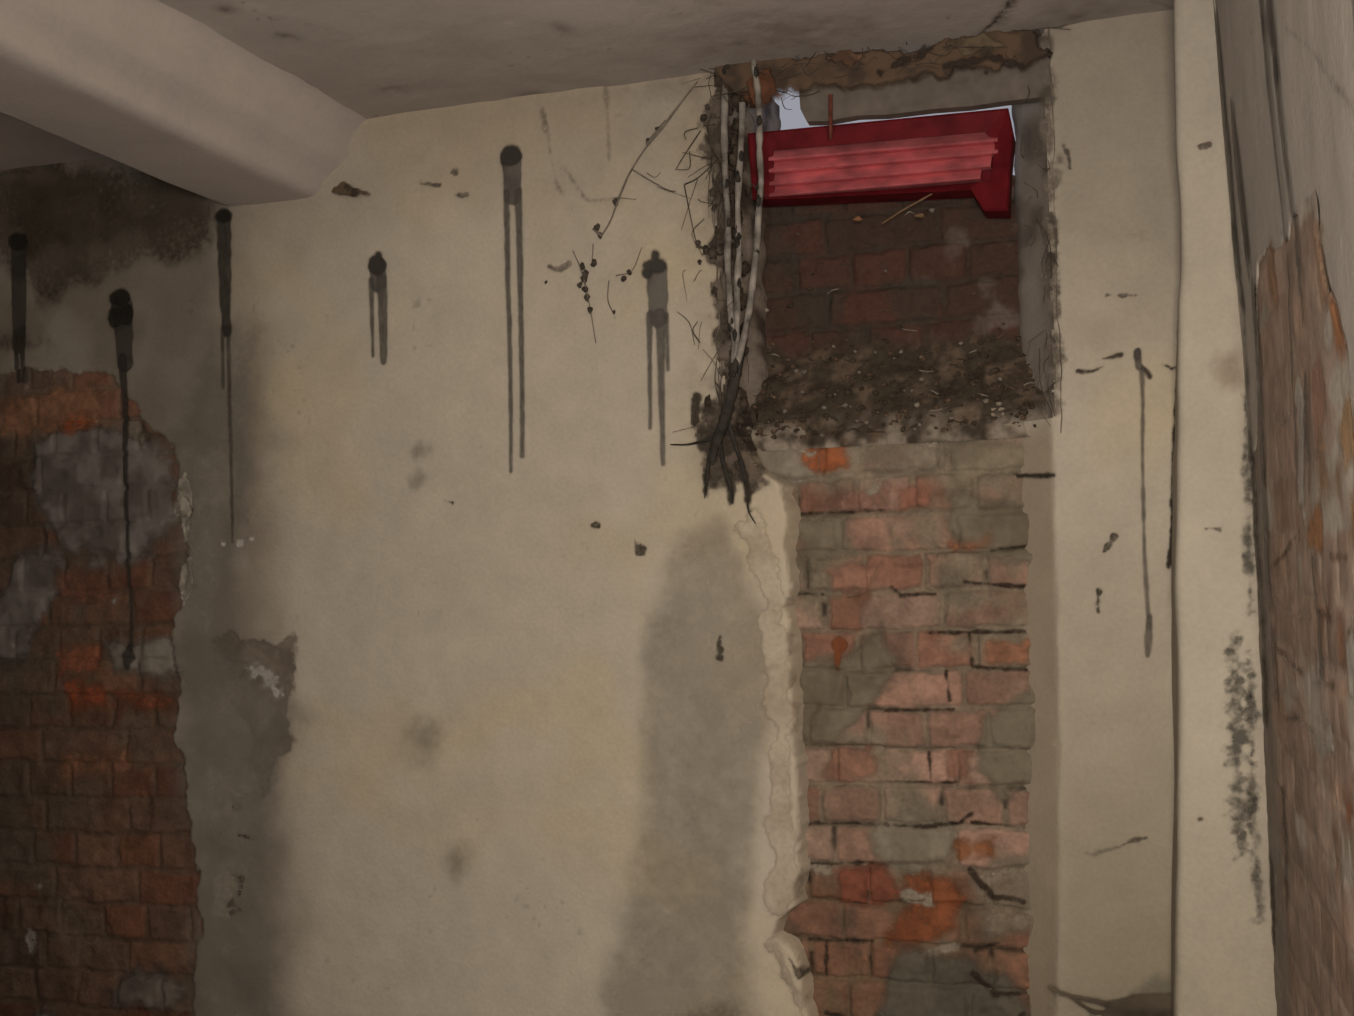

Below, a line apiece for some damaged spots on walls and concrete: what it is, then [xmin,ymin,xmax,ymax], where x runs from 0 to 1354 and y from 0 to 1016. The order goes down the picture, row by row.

spalling [0,367,204,1016]
water stain [0,163,297,1016]
water stain [368,252,387,364]
water stain [500,145,524,472]
water stain [642,250,669,465]
water stain [611,540,762,1016]
spalling [715,29,1049,107]
spalling [735,407,1036,1016]
water stain [1213,1,1276,849]
water stain [1252,788,1287,942]
water stain [1259,0,1310,497]
spalling [1251,189,1354,1016]